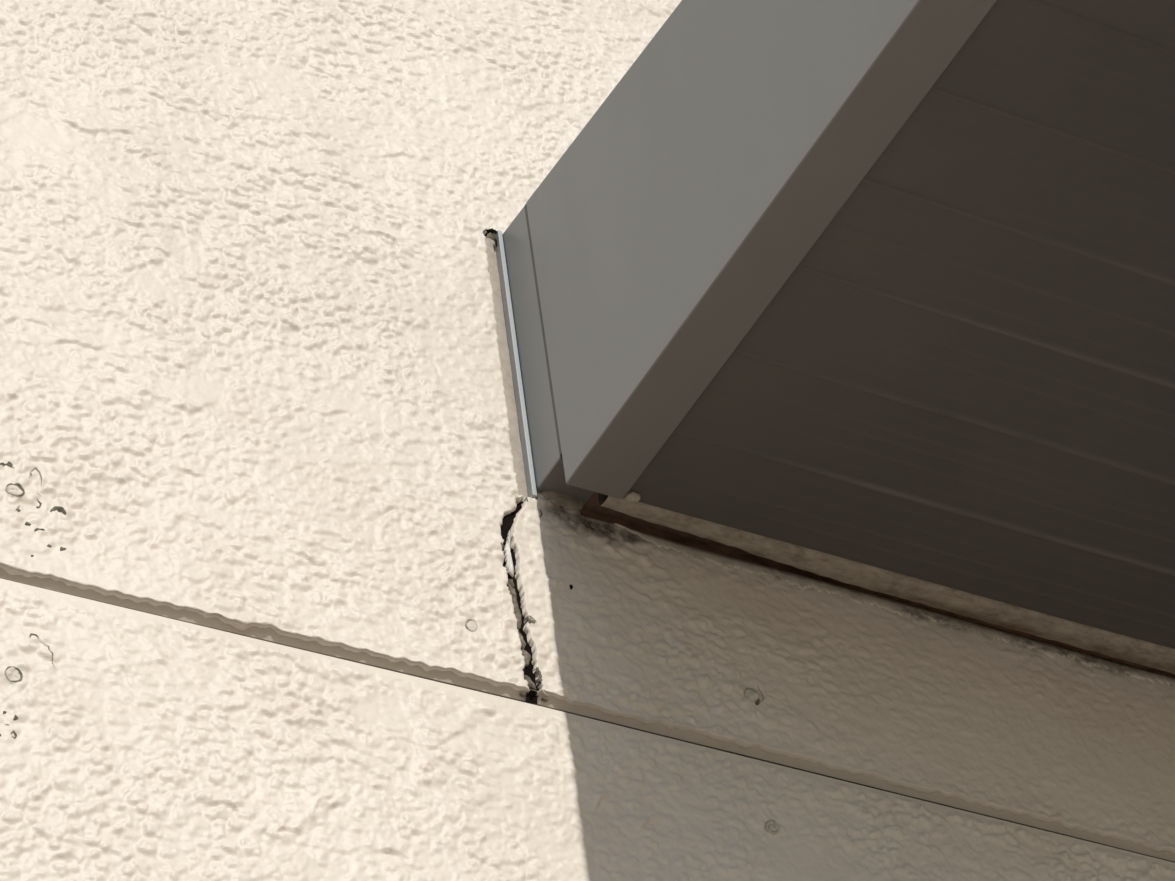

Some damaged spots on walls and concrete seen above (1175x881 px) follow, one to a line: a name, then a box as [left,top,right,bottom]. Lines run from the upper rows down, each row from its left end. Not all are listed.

crack [501,499,551,704]